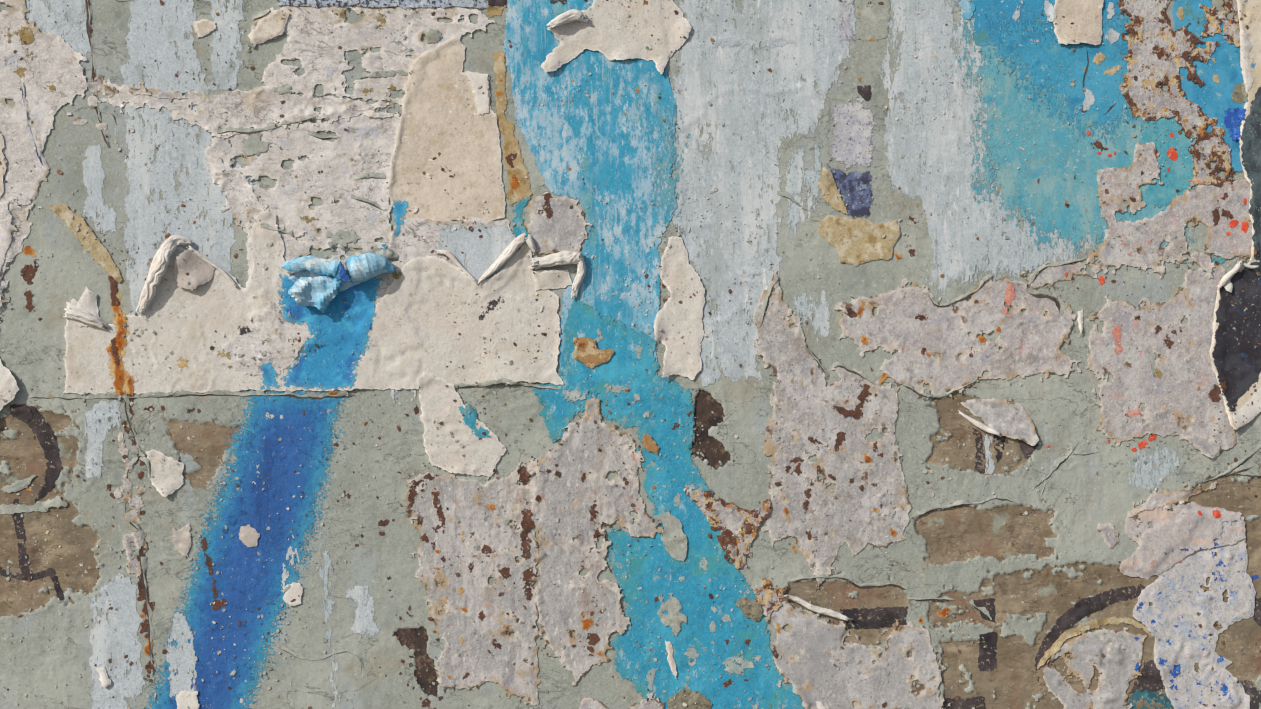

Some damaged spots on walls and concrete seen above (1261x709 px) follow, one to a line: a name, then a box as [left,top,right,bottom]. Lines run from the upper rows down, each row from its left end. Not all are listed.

rust [106,248,165,479]
peeling [709,0,1261,709]
rust [1207,167,1234,226]
peeling [393,382,735,709]